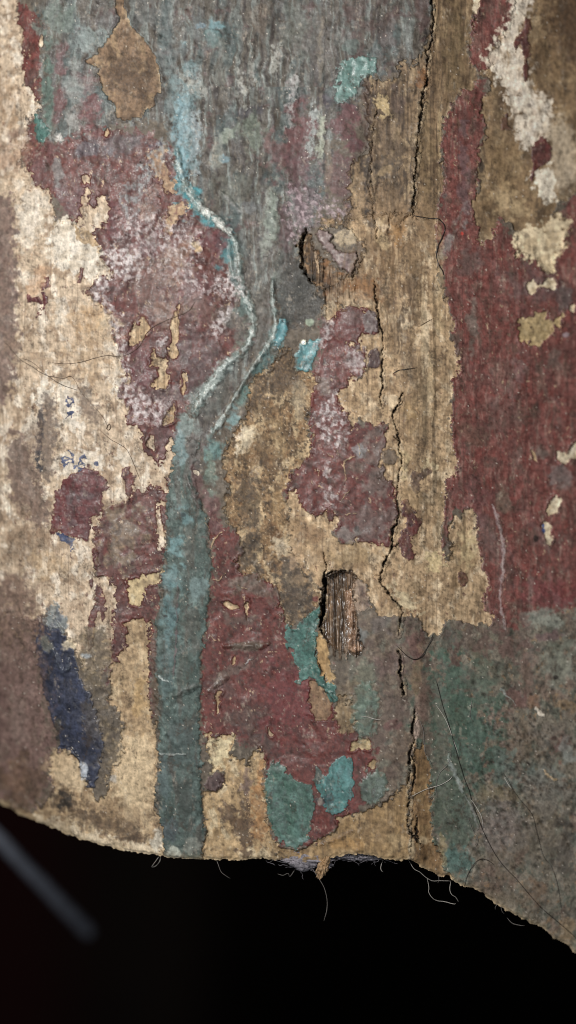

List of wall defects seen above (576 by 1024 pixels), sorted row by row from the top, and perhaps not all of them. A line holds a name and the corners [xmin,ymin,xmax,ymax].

peeling [0,0,191,855]
peeling [201,730,454,879]
crack [352,275,423,848]
peeling [222,0,576,769]
crack [368,0,439,239]